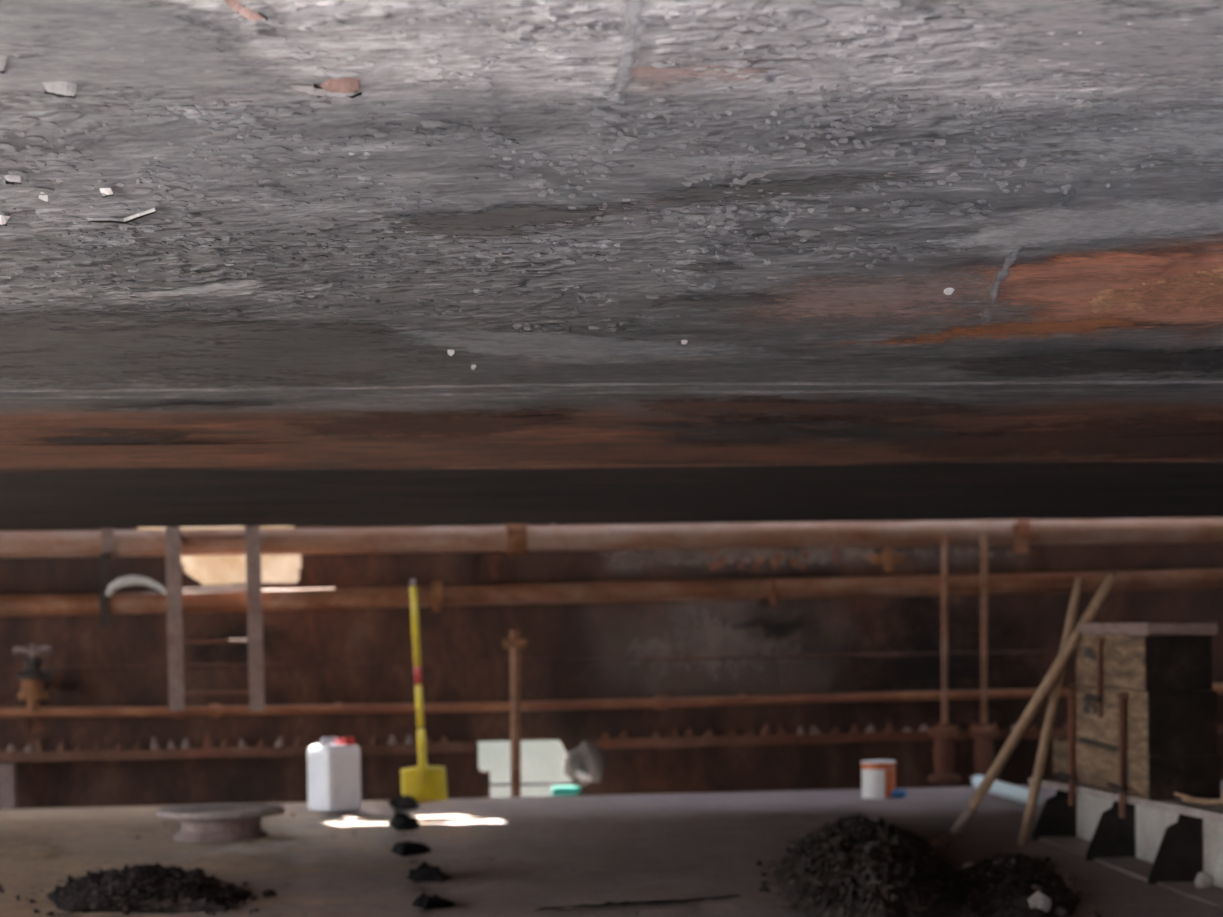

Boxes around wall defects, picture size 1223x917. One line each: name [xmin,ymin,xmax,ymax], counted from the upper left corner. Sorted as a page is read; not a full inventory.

peeling [0,0,1223,333]
leakage [398,173,916,240]
corrosion [744,242,1223,344]